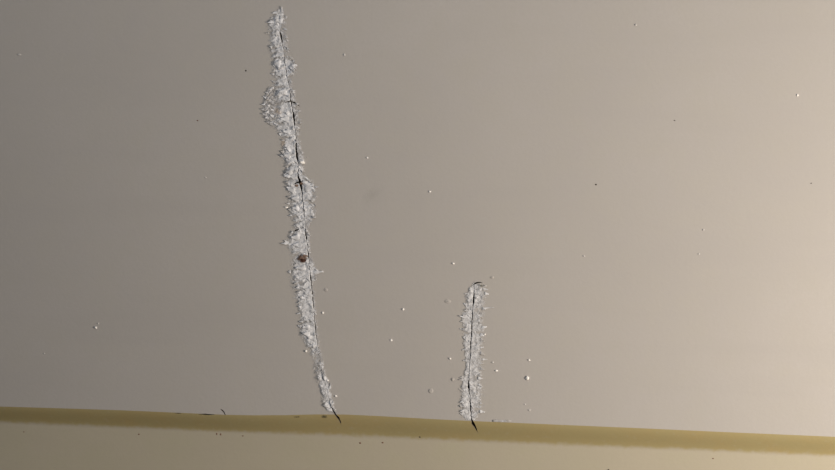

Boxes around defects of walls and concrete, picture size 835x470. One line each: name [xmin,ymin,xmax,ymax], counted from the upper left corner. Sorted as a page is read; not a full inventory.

crack [280,33,322,366]
crack [468,282,482,432]